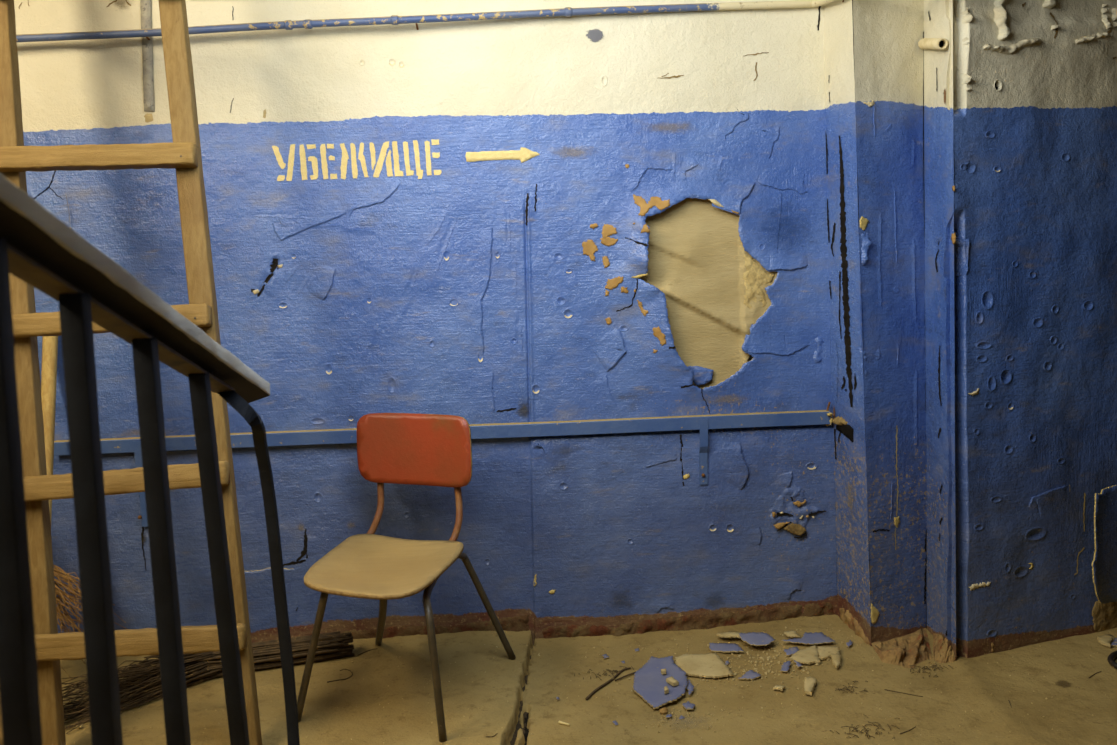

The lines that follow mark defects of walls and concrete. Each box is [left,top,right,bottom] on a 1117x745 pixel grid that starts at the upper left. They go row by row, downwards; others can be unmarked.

spalling [983,38,1044,55]
spalling [1075,32,1108,44]
crack [525,184,538,226]
peeling [582,157,810,405]
crack [841,373,857,391]
spalling [770,471,827,539]
peeling [1091,485,1117,647]
spalling [343,601,962,668]
crack [510,644,534,745]